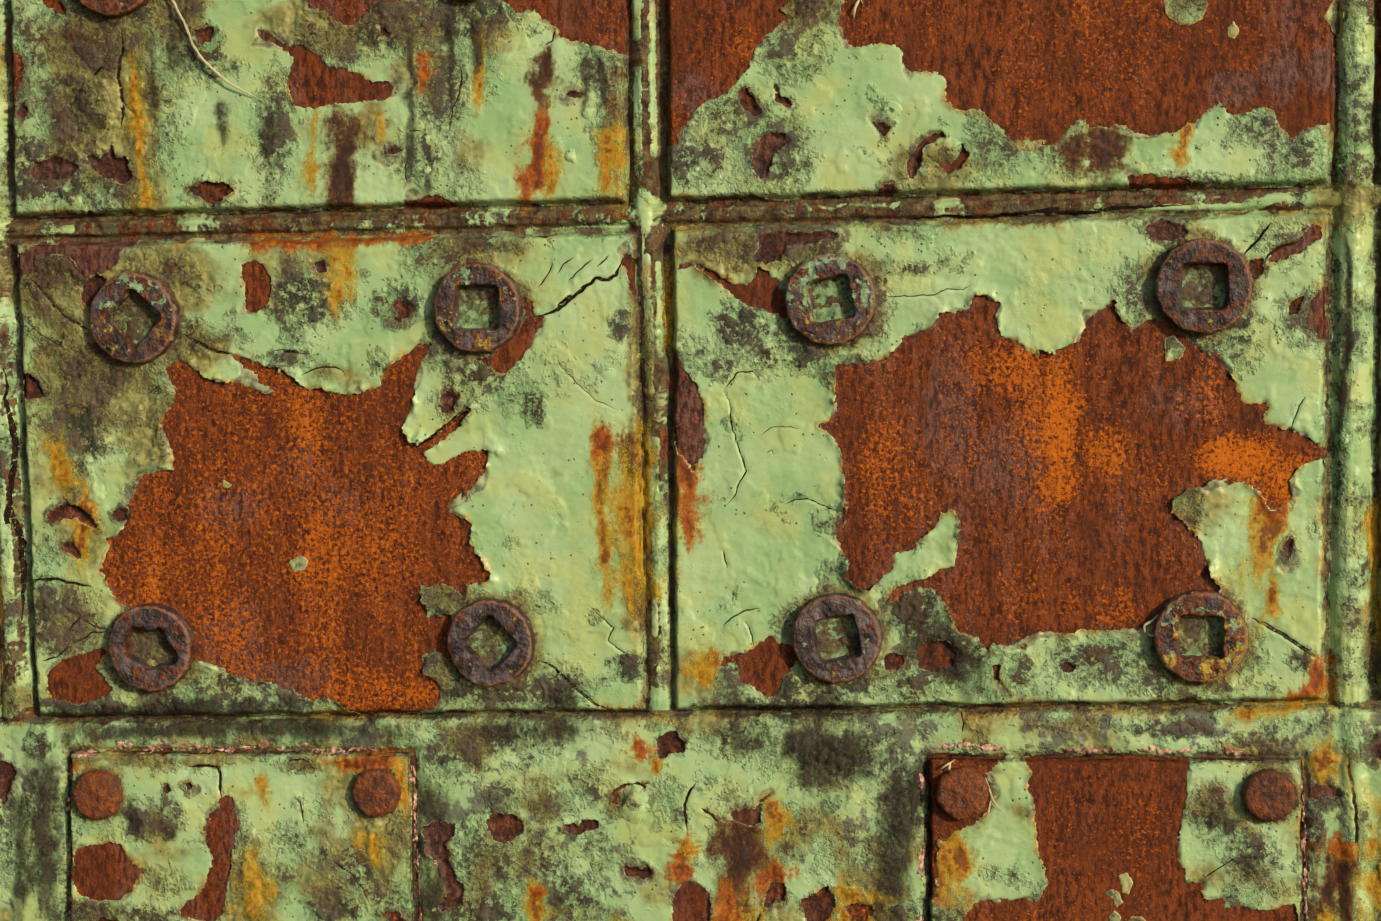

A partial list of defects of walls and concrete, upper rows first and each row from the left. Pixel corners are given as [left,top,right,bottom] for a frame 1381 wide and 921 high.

leakage [216,102,228,142]
leakage [262,107,276,165]
corrosion [513,46,561,214]
peeling [839,0,1344,145]
crack [534,255,623,317]
crack [3,368,107,661]
peeling [99,342,491,714]
corrosion [589,420,661,627]
crack [723,371,800,508]
peeling [818,295,1327,650]
corrosion [1240,494,1290,625]
leakage [723,695,926,904]